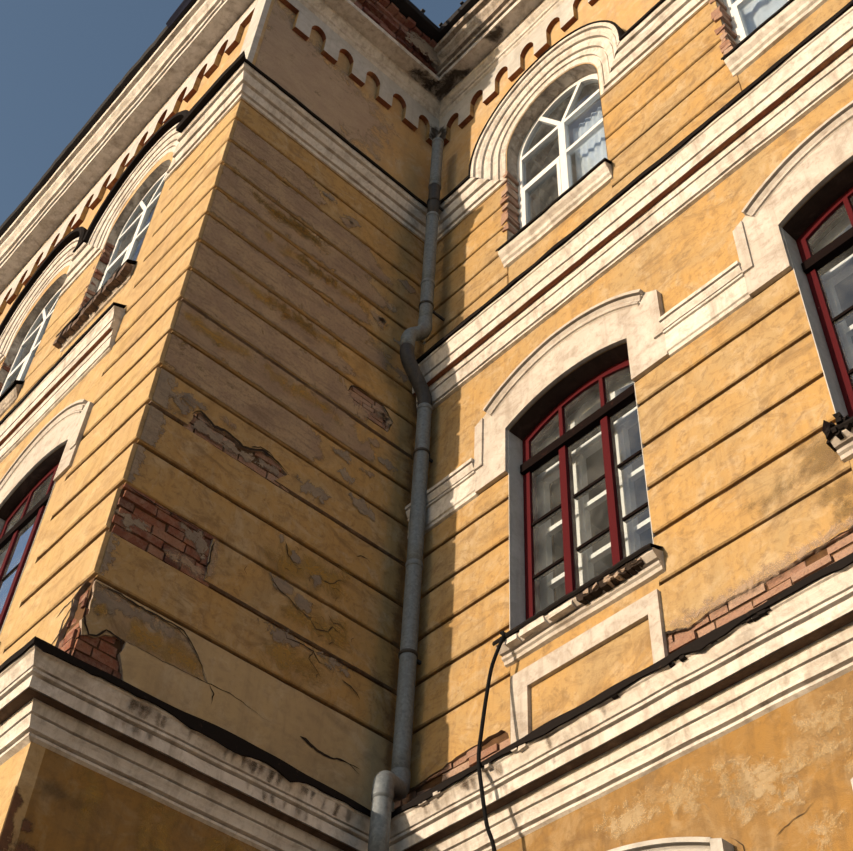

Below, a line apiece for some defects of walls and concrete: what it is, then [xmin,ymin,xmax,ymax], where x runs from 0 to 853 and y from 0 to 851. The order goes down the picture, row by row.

flaking render [52,121,416,697]
spalling [665,519,853,668]
crack [126,641,276,726]
crack [300,736,359,774]
spalling [394,738,528,809]